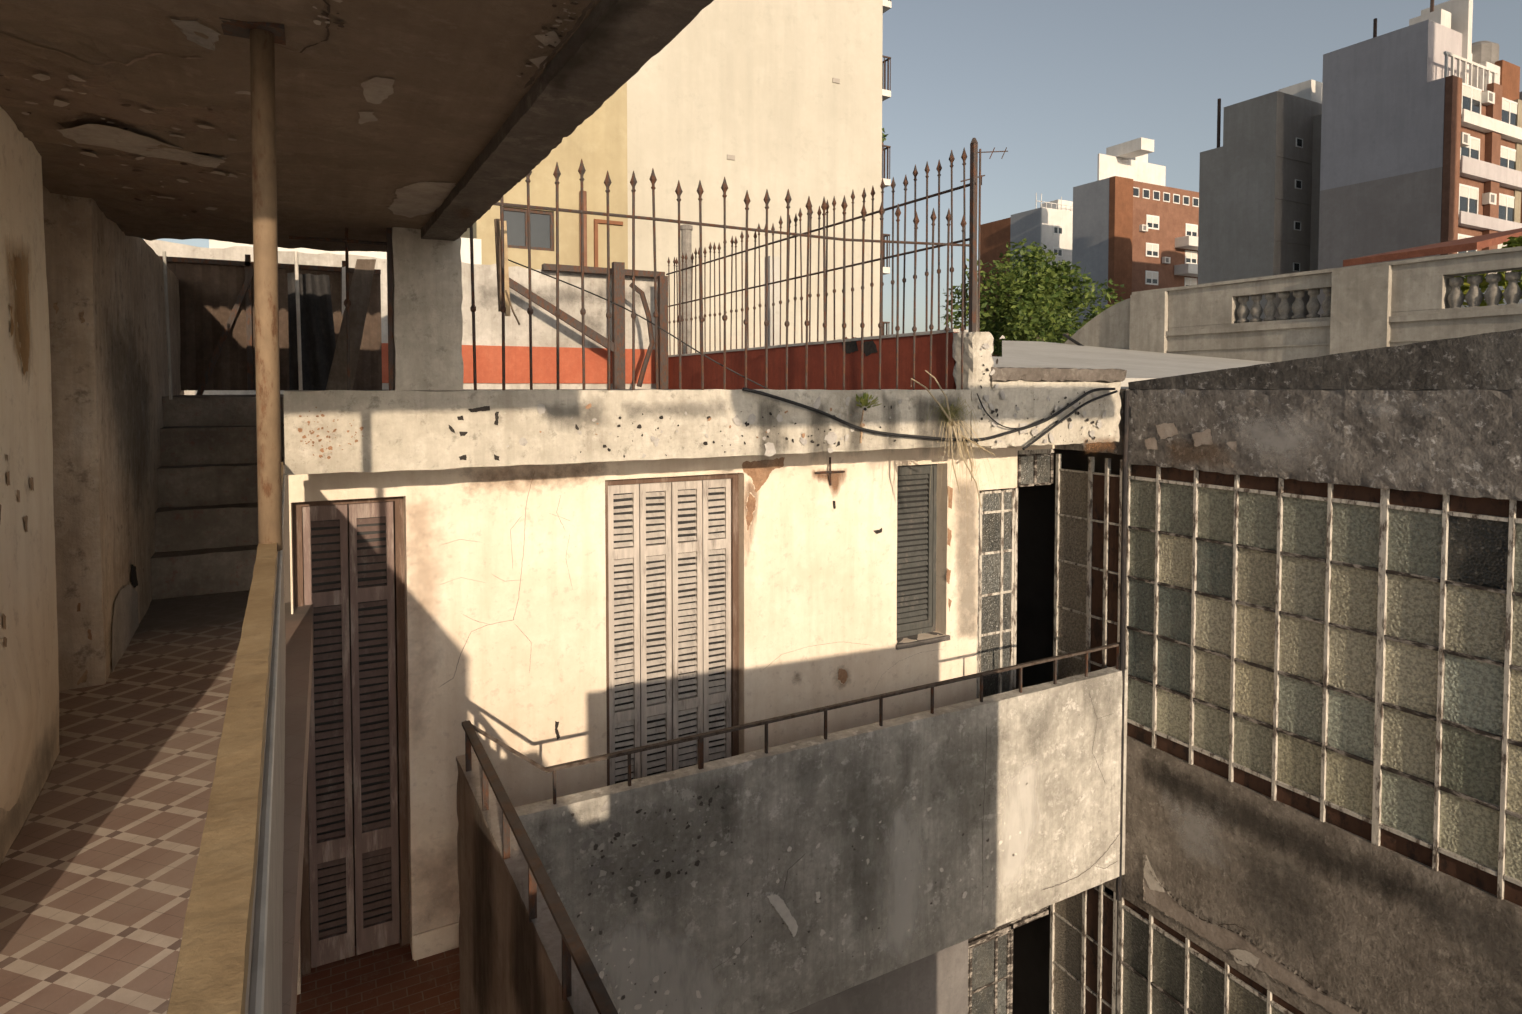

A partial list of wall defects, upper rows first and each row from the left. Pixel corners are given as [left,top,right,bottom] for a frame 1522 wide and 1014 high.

peeling [516,1,579,77]
peeling [494,404,546,461]
spalling [571,396,902,532]
crack [438,472,573,688]